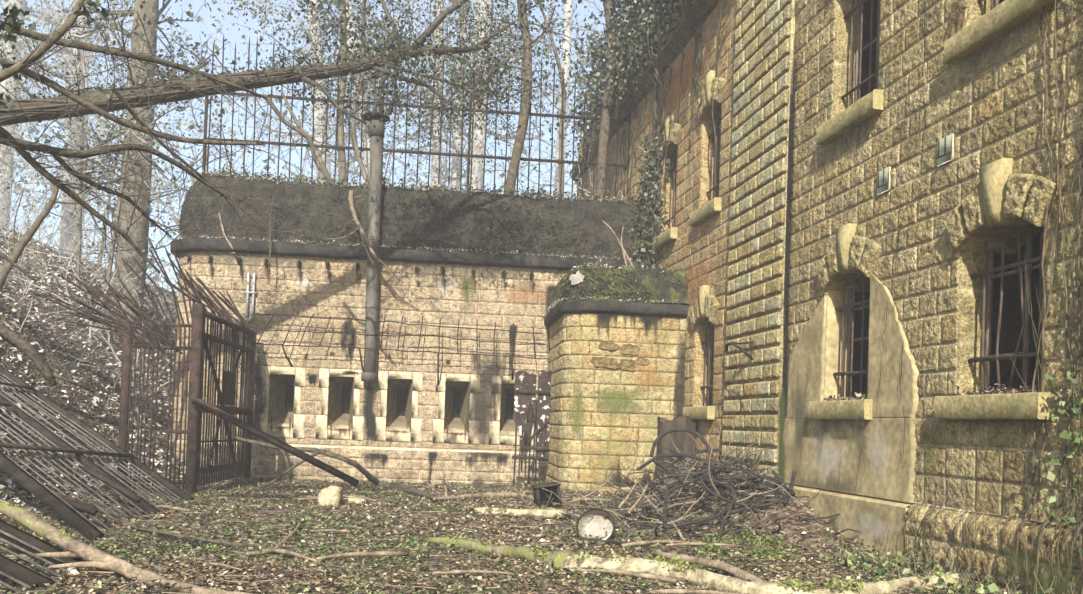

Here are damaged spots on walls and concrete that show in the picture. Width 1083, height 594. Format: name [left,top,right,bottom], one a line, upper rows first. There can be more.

damp [420,266,510,295]
damp [601,391,631,410]